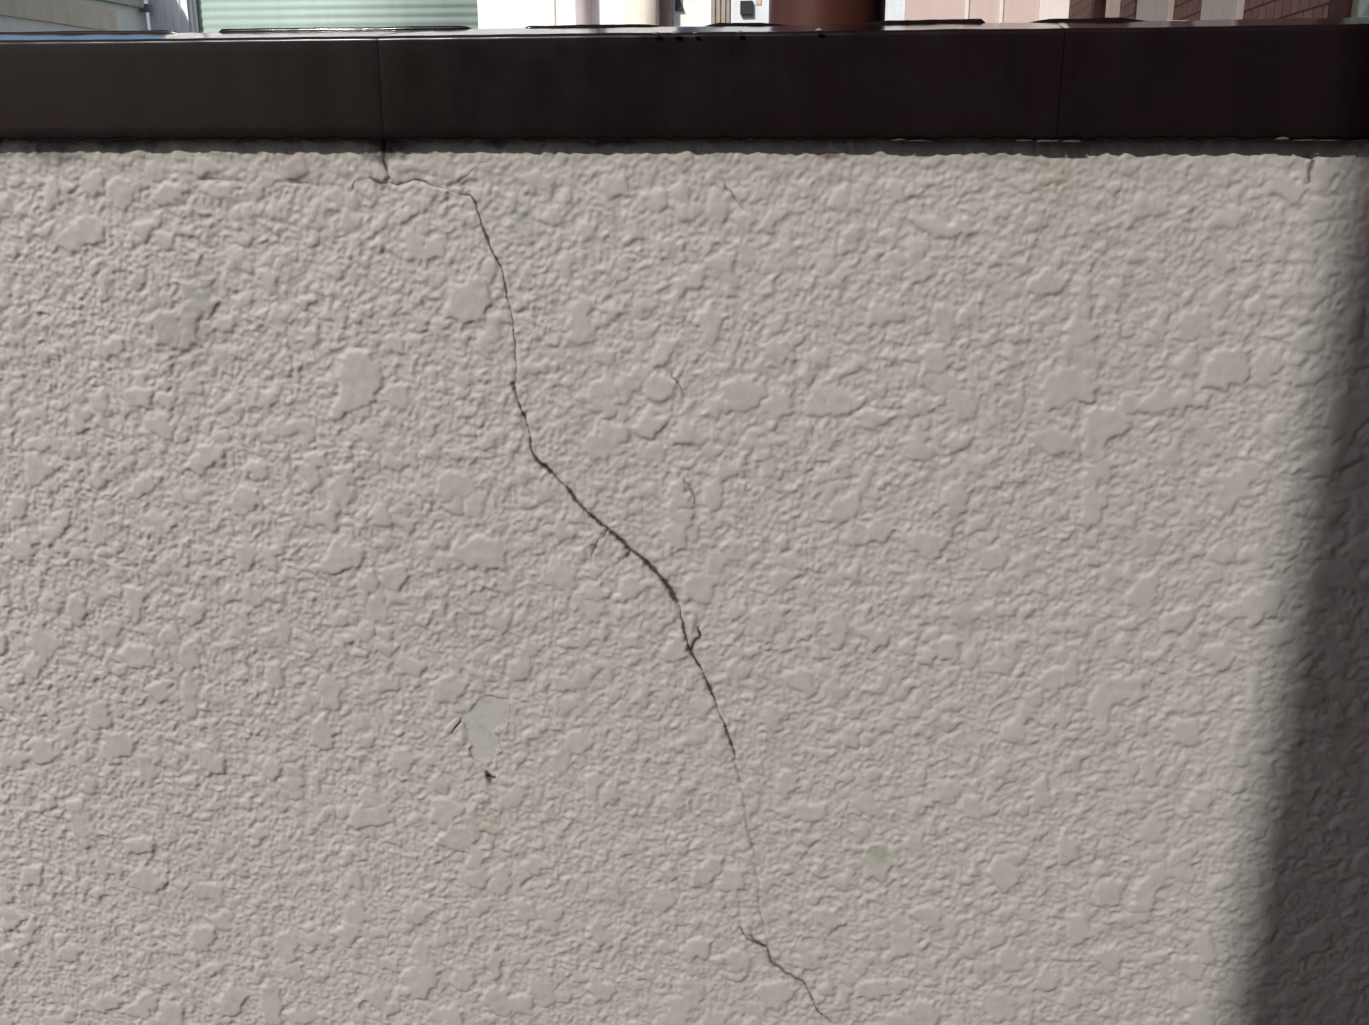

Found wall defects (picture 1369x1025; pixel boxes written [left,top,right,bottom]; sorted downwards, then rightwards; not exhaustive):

crack [352,140,735,755]
crack [741,929,823,1015]